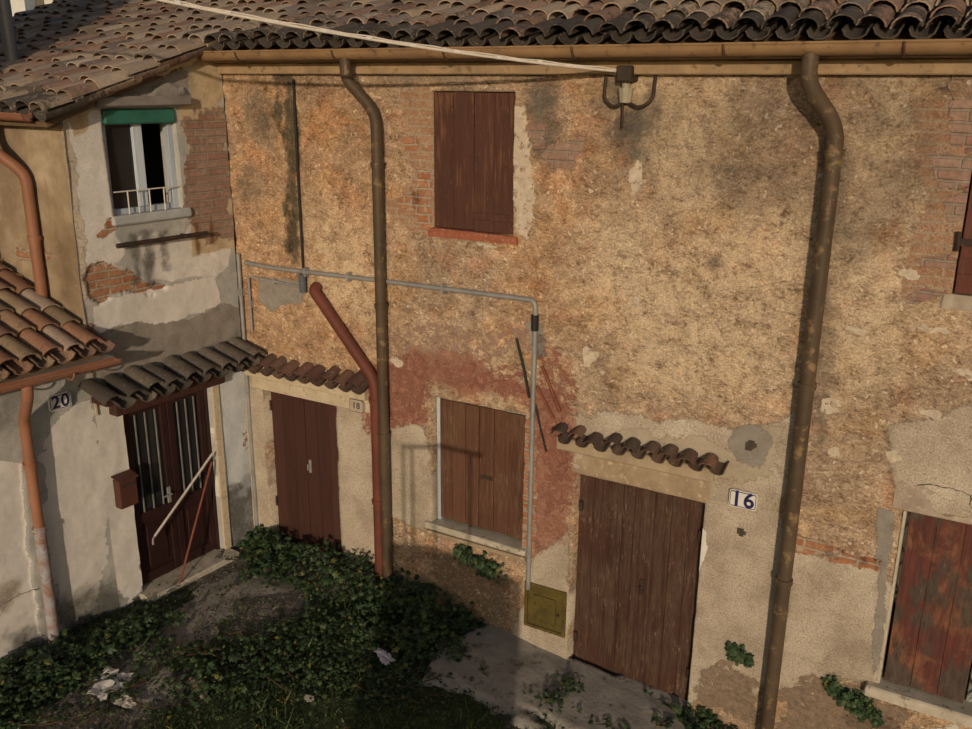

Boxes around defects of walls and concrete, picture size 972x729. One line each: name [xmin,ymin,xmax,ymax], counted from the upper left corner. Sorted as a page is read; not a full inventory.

flaking render [60,118,165,304]
flaking render [181,106,234,246]
damp [273,74,300,258]
flaking render [906,287,947,303]
flaking render [925,95,972,222]
peeling [0,460,43,662]
peeling [36,400,143,631]
peeling [358,319,579,559]
peeling [795,508,896,673]